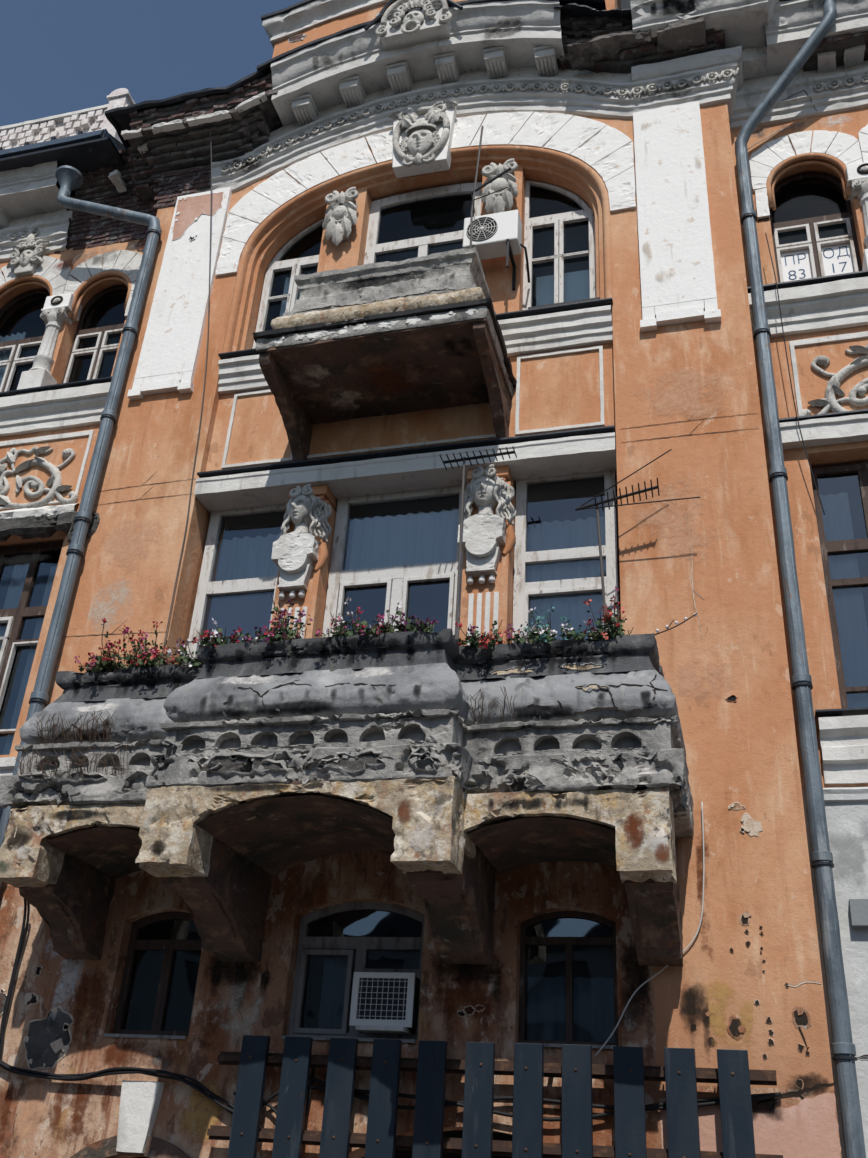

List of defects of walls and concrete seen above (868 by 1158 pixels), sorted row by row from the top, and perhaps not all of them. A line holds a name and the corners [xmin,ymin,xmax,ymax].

peeling [172,192,224,242]
flaking render [19,769,108,786]
flaking render [151,738,183,770]
flaking render [206,752,288,777]
flaking render [313,748,385,777]
flaking render [408,750,445,774]
peeling [728,802,763,837]
leakage [208,957,268,1004]
leakage [441,955,501,1002]
flaking render [23,993,74,1071]
leakage [681,982,729,1043]
leakage [181,1082,220,1139]